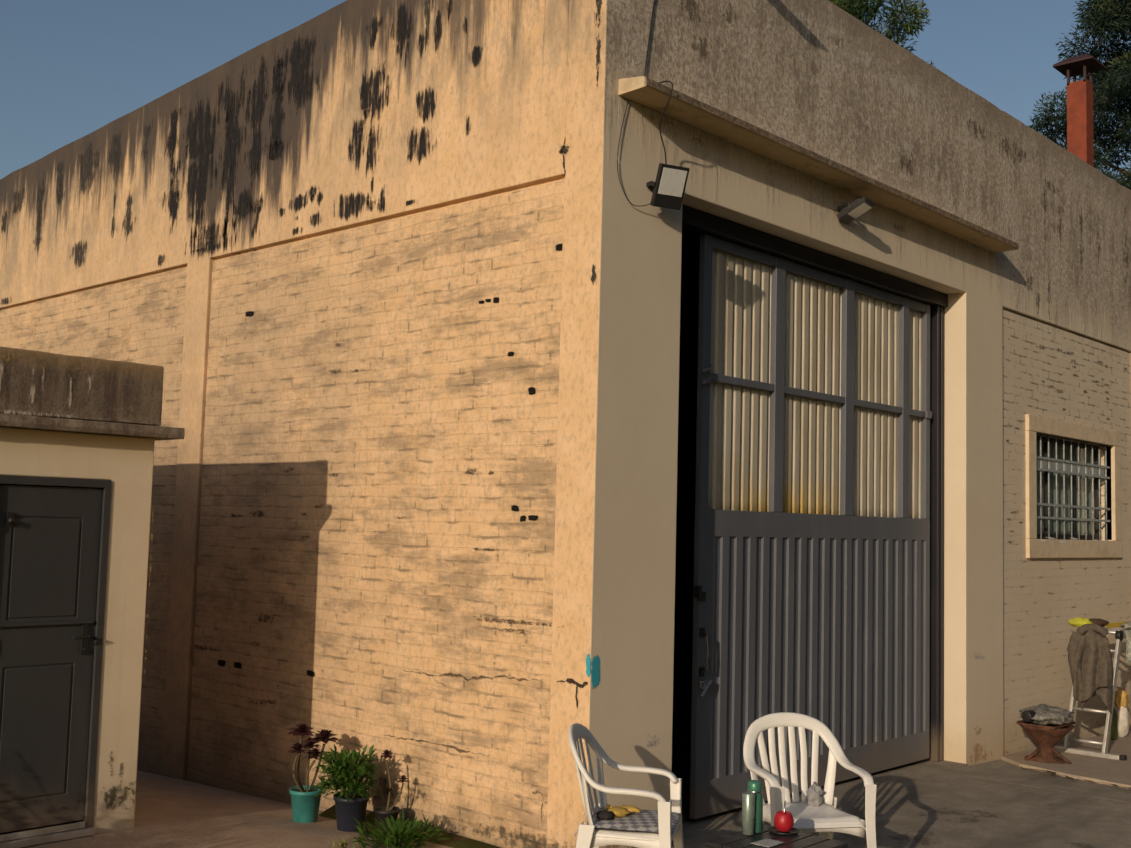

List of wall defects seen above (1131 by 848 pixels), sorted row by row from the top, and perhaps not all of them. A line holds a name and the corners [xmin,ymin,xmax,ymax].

leakage [367,0,452,70]
leakage [468,45,482,66]
leakage [1,162,65,251]
leakage [79,130,133,243]
leakage [162,36,320,256]
leakage [333,64,391,221]
leakage [407,88,437,164]
leakage [70,240,87,267]